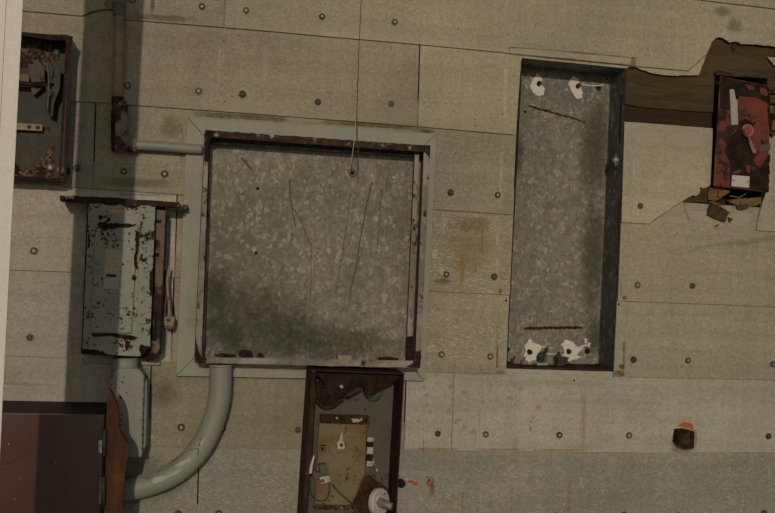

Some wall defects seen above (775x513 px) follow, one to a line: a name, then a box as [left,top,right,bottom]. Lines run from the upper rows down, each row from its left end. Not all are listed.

spalling [712,70,775,136]
spalling [682,184,762,222]